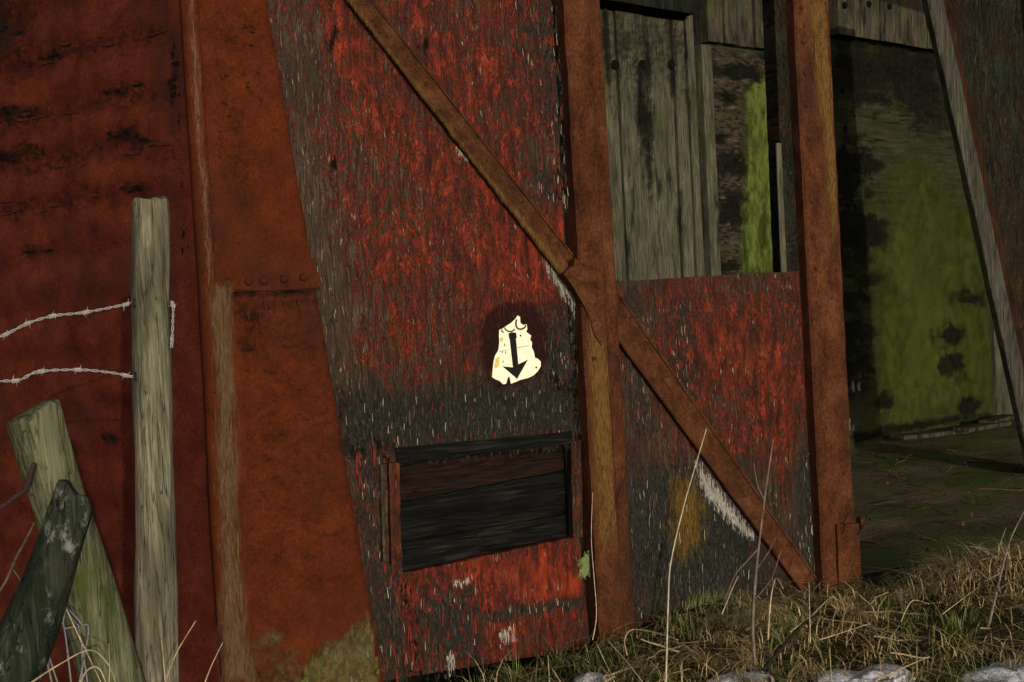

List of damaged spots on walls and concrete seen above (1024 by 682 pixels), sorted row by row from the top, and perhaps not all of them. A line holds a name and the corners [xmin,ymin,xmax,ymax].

leakage [603,0,702,199]
leakage [715,134,747,183]
leakage [712,53,764,110]
corrosion [807,0,837,243]
leakage [836,153,900,409]
leakage [916,175,986,413]
peeling [335,261,586,682]
corrosion [587,320,617,546]
corrosion [664,476,704,562]